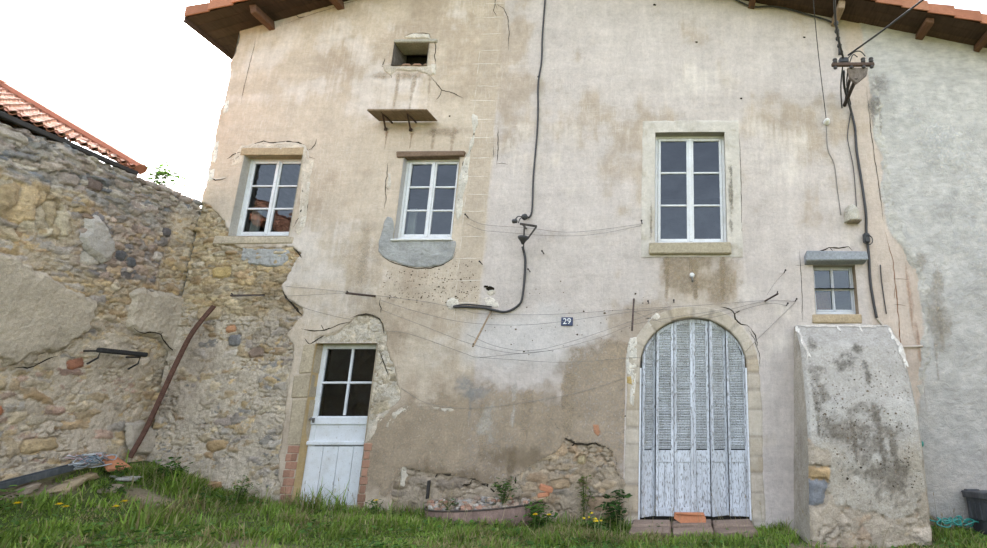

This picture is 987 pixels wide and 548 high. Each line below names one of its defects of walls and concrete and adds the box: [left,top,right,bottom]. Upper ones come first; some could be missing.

crack [403,33,460,99]
flaking render [231,143,314,235]
flaking render [0,253,97,368]
flaking render [126,204,303,502]
flaking render [314,315,454,443]
flaking render [391,425,628,523]
leakage [826,409,907,496]